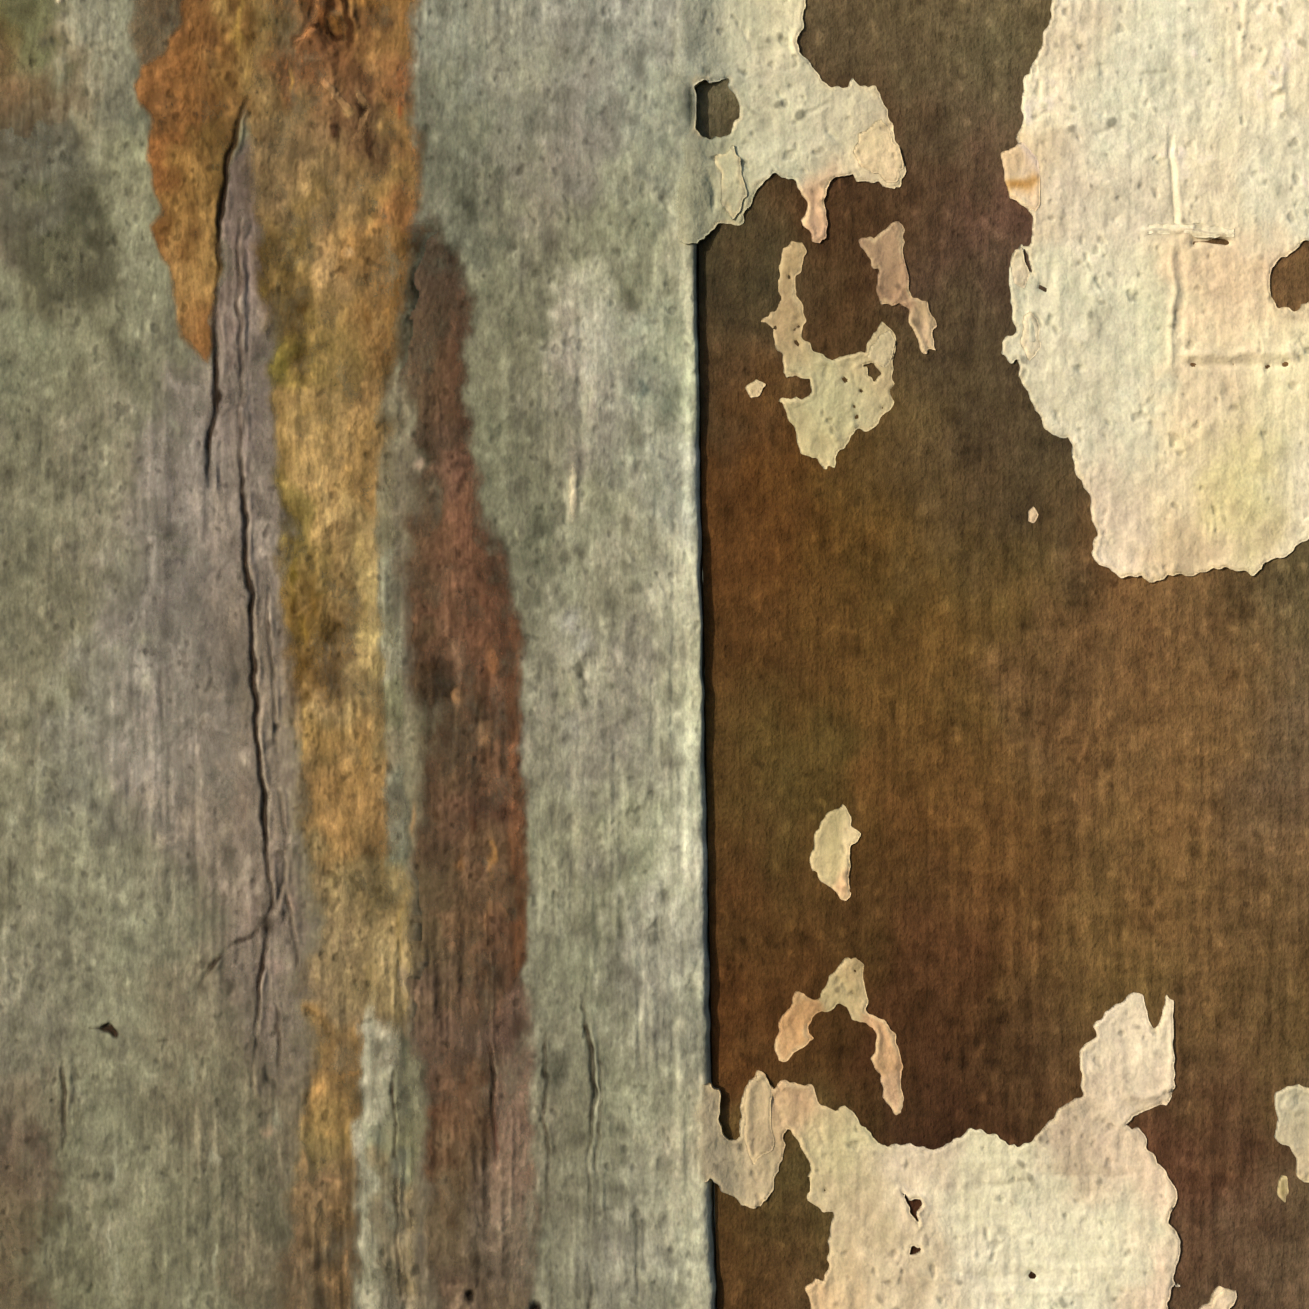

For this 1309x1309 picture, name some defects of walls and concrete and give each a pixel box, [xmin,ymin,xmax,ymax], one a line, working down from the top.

crack [215,121,239,293]
peeling [677,0,906,469]
peeling [858,221,937,354]
peeling [1001,0,1309,583]
crack [207,354,221,463]
crack [240,479,291,919]
rust [129,0,535,1309]
peeling [810,804,861,901]
crack [209,936,280,1045]
peeling [774,957,904,1115]
peeling [696,992,1180,1309]
peeling [1274,1084,1309,1202]